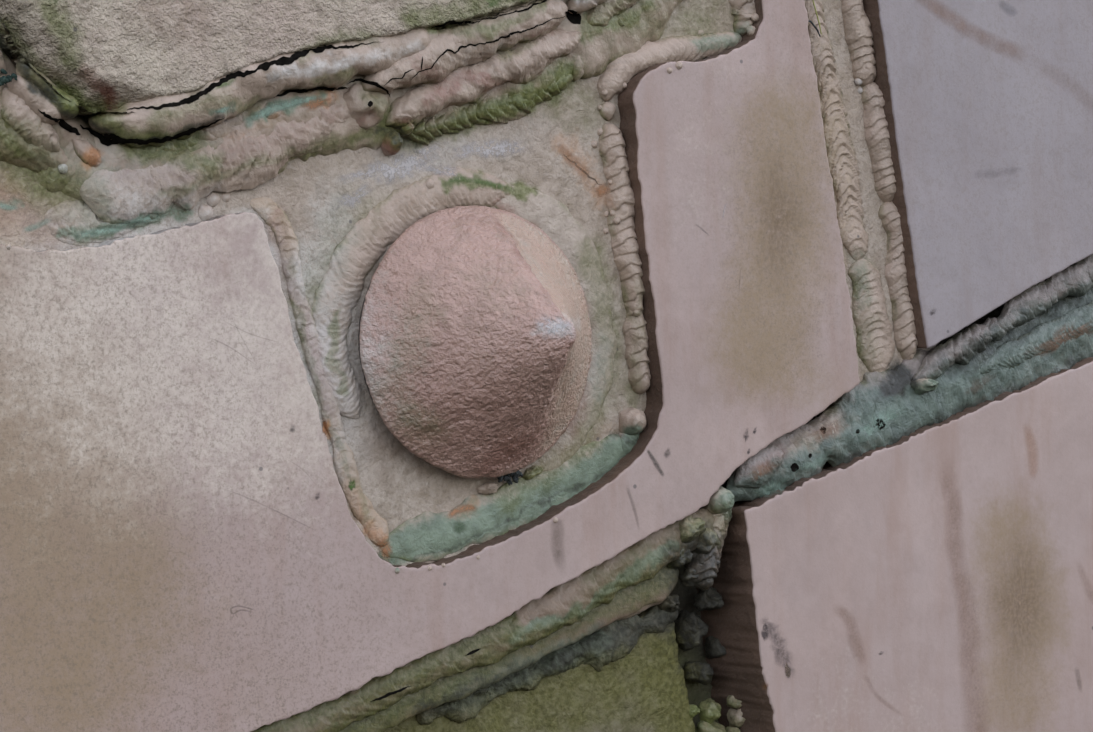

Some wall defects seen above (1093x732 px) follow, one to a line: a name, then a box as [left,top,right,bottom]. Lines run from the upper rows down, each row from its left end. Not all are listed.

crack [38,0,565,146]